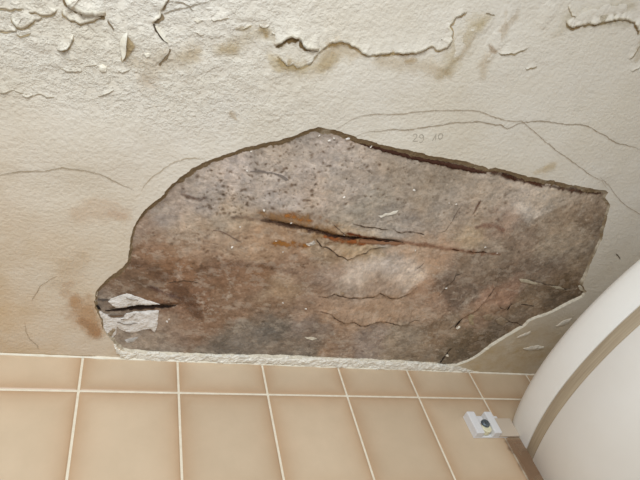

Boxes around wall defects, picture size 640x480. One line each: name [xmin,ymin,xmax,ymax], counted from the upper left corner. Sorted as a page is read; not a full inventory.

peeling [0,0,106,52]
peeling [115,32,135,73]
peeling [140,0,170,43]
peeling [193,0,470,69]
peeling [566,0,640,35]
crack [343,110,639,214]
crack [262,221,403,243]
rust [260,211,435,248]
spalling [94,127,610,372]
crack [96,298,176,325]